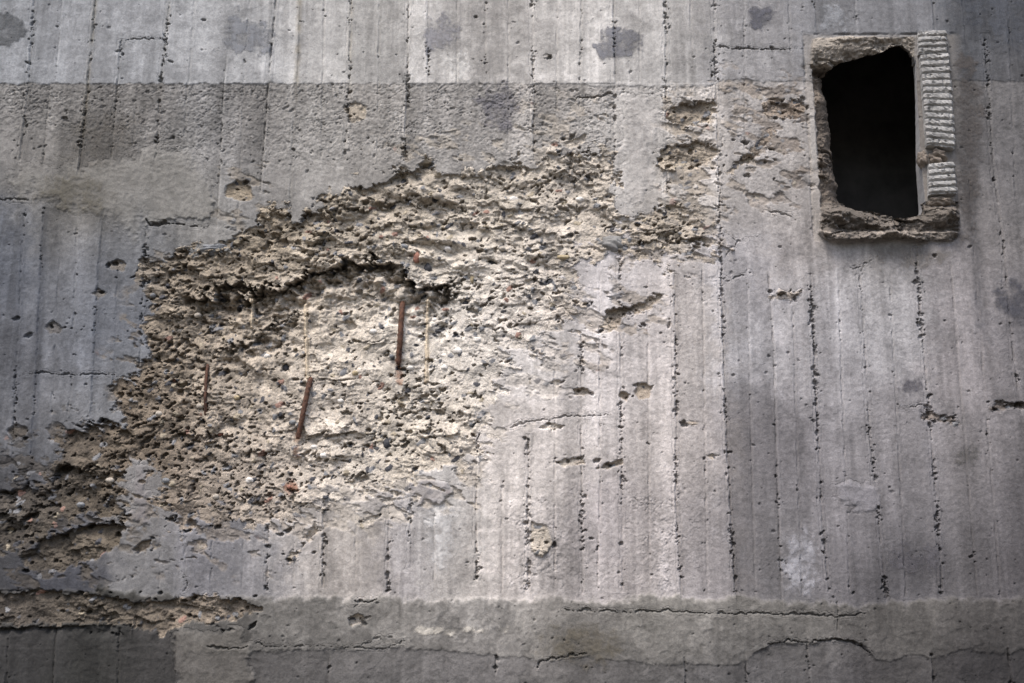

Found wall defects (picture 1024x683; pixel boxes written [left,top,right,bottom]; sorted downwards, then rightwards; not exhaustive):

water stain [592,26,643,60]
spalling [656,98,722,172]
spalling [724,96,813,178]
rust [395,301,405,365]
rust [296,377,313,439]
spalling [0,133,735,639]
crack [561,589,875,658]
crack [534,649,590,670]